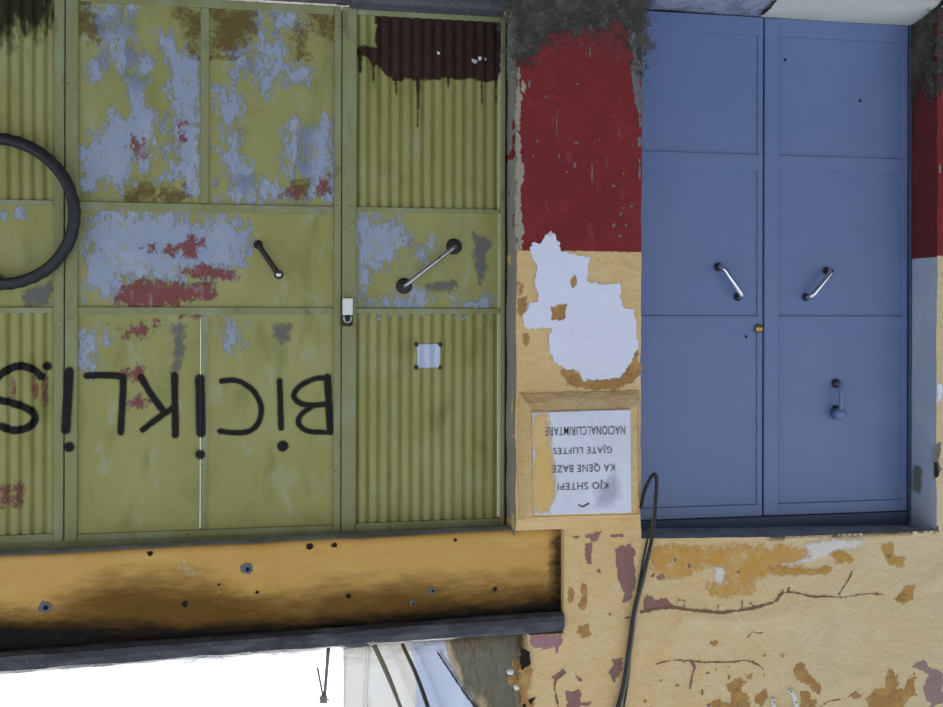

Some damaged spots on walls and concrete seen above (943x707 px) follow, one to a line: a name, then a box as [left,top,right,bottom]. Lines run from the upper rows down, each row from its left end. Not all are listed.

damp [0,0,54,47]
corrosion [357,12,504,126]
damp [497,0,658,81]
damp [910,7,943,104]
peeling [79,1,342,306]
peeling [560,350,643,391]
damp [149,655,247,664]
damp [0,535,561,651]
peeling [573,531,636,603]
peeling [648,542,854,599]
crack [640,571,883,689]
peeling [851,660,943,707]